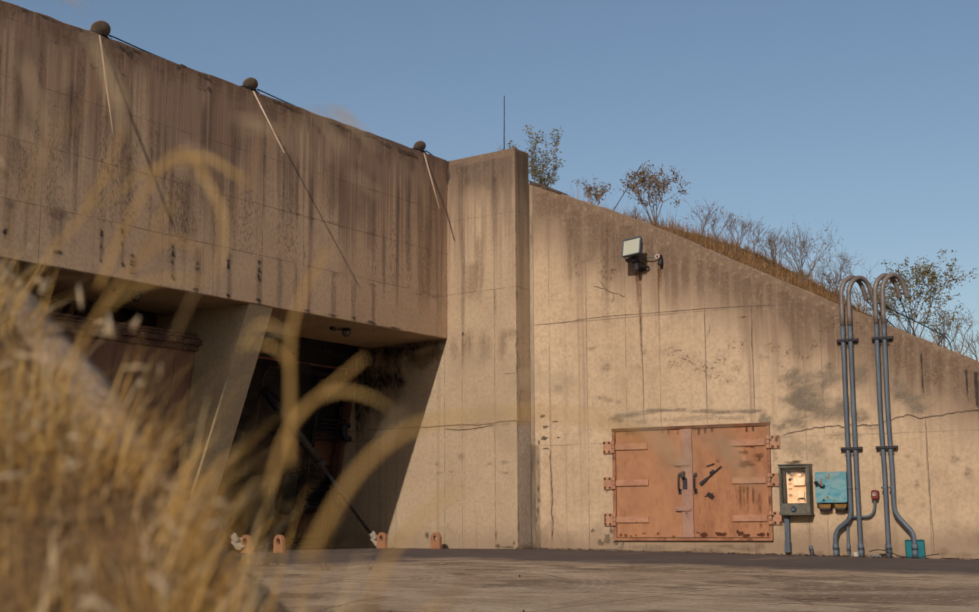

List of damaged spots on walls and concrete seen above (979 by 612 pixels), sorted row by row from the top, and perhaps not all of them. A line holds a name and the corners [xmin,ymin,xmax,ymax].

corrosion [696,526,769,537]
crack [785,409,979,553]